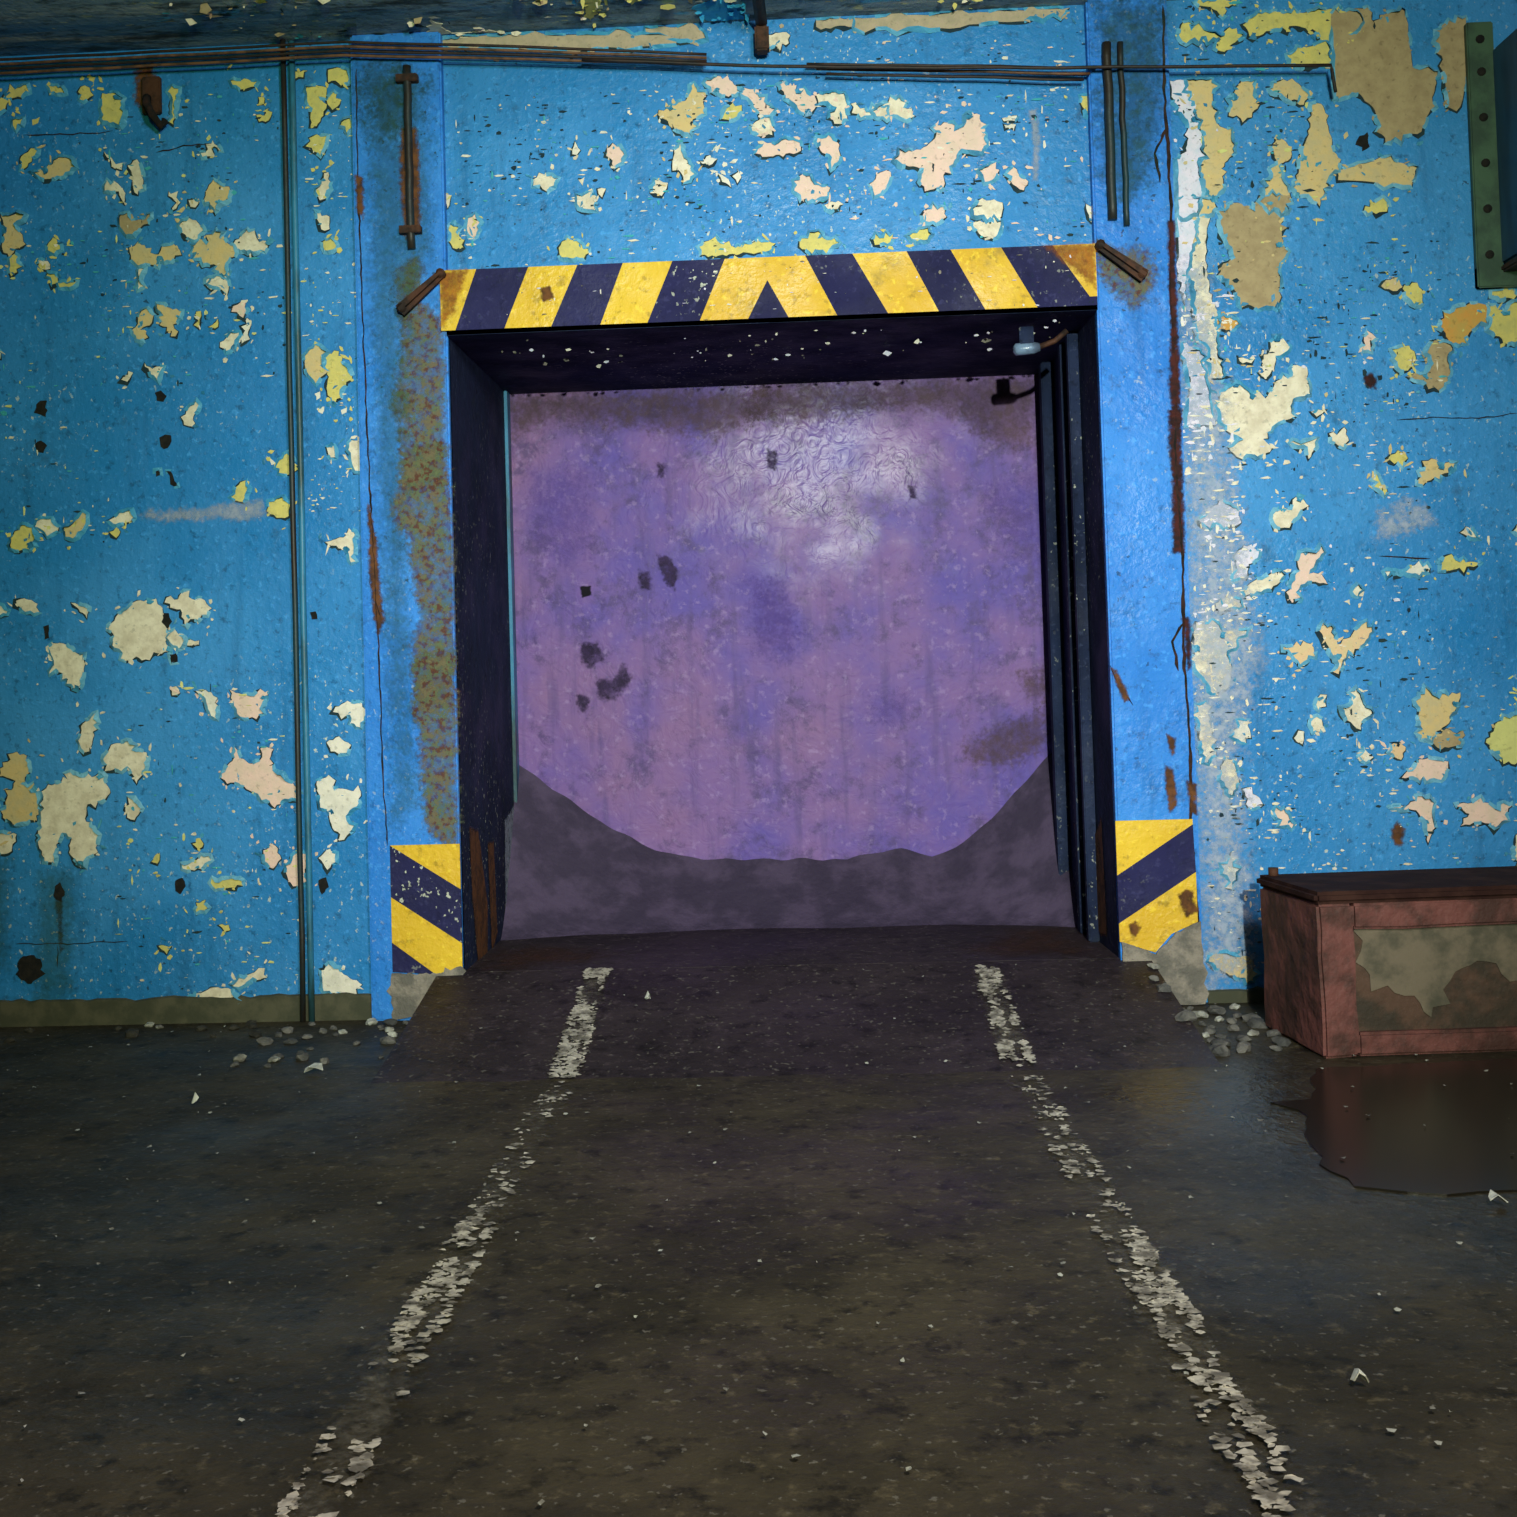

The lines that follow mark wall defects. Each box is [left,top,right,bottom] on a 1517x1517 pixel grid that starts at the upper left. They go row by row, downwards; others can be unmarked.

peeling [0,439,137,554]
peeling [0,64,292,389]
peeling [0,587,367,1004]
peeling [180,391,205,429]
peeling [161,0,385,39]
peeling [227,66,360,530]
peeling [318,528,360,566]
corrosion [389,257,498,960]
peeling [407,0,1092,320]
corrosion [1047,220,1185,553]
corrosion [1182,617,1192,668]
peeling [1121,0,1517,1005]